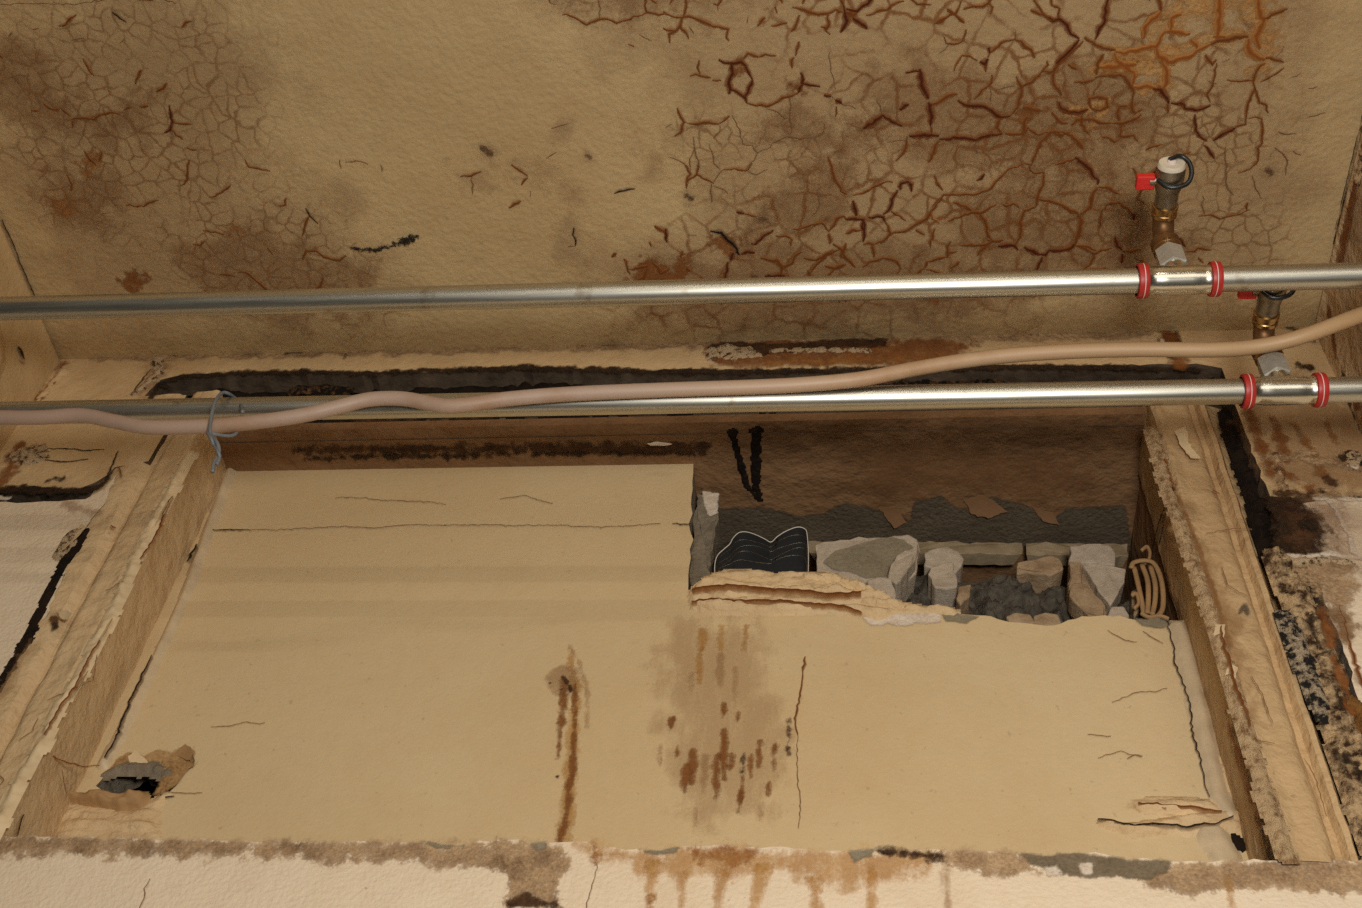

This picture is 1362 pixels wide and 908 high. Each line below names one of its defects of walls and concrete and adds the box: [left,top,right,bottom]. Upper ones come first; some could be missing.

crack [0,0,346,296]
crack [461,123,569,208]
crack [549,0,1323,327]
spalling [0,441,118,486]
spalling [716,495,1131,554]
peeling [0,451,570,908]
rust [550,657,580,842]
rust [676,748,698,791]
rust [713,703,791,804]
crack [794,656,806,827]
spalling [941,426,1362,896]
rust [592,841,944,908]